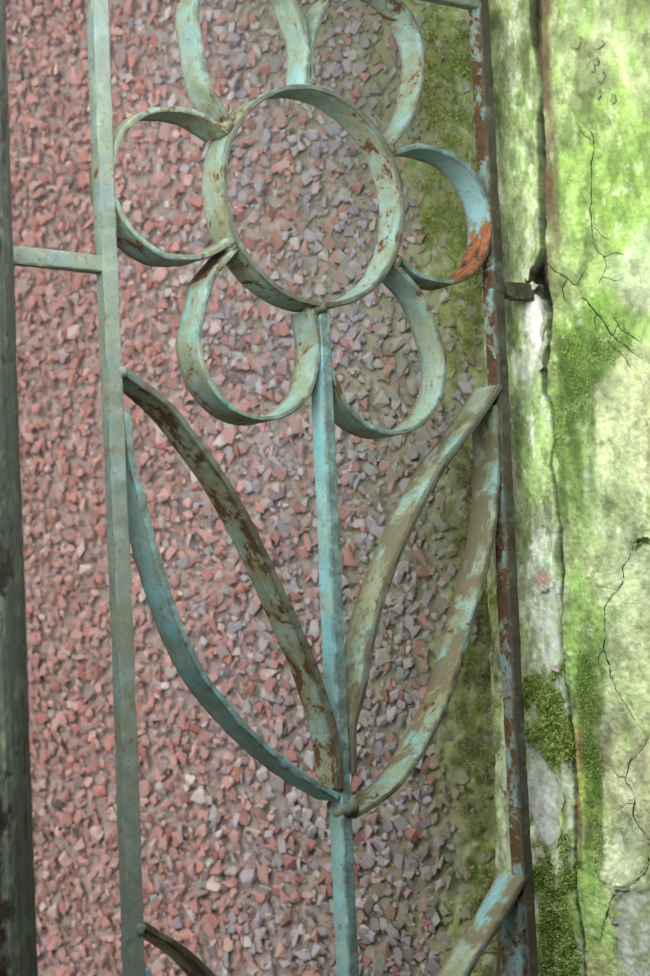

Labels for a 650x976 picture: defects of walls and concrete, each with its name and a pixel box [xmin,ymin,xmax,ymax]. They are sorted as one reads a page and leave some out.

spalling [5,0,95,255]
spalling [109,0,324,683]
spalling [199,0,485,645]
crack [549,126,642,372]
spalling [14,265,123,976]
spalling [123,394,316,779]
spalling [130,545,337,976]
spalling [350,452,471,797]
spalling [352,705,497,976]
crack [597,538,650,942]